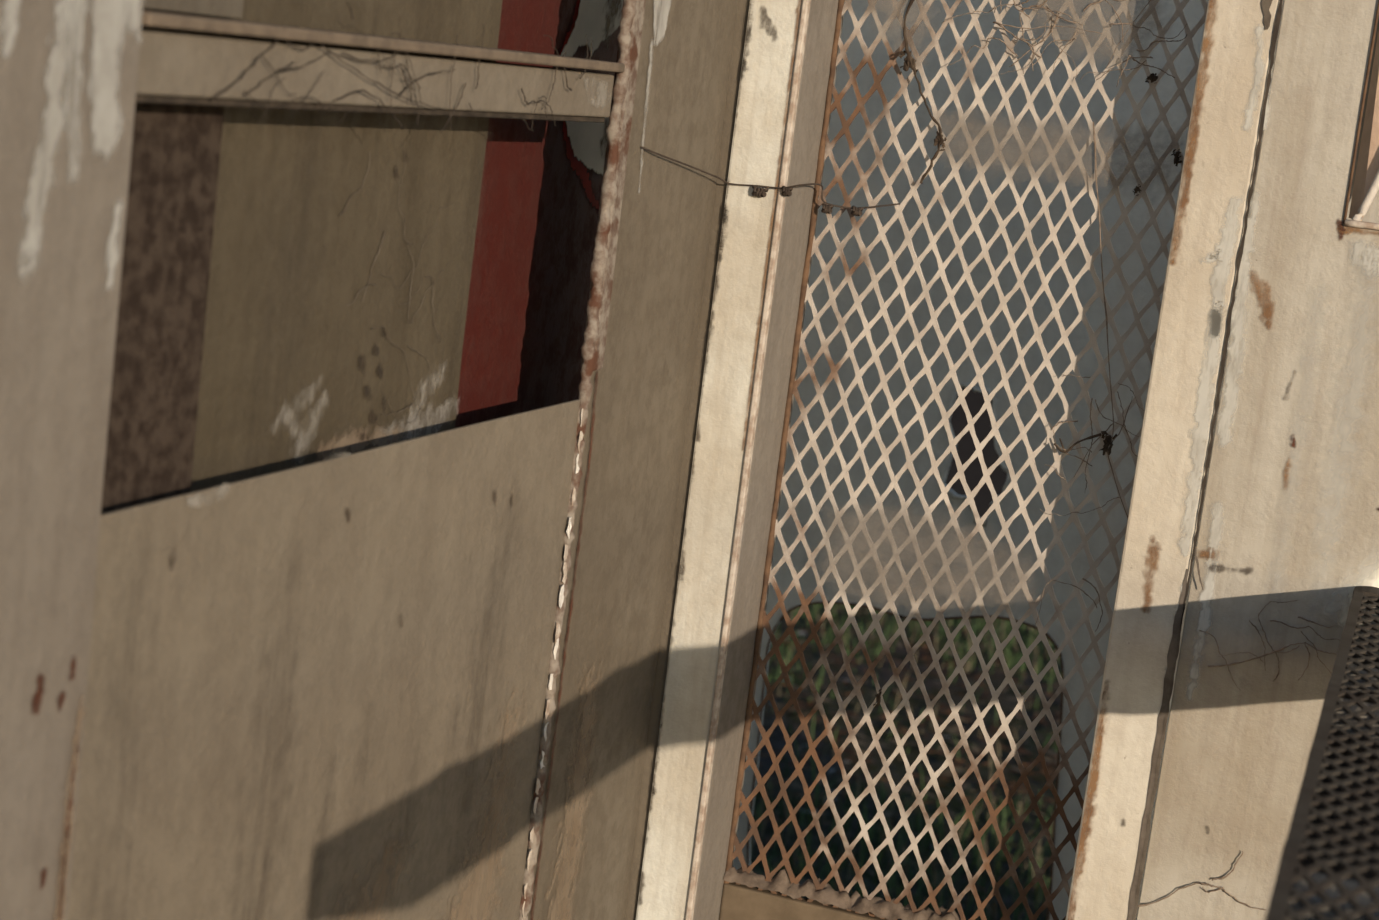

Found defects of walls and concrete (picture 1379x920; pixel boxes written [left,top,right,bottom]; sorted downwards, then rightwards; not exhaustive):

peeling [563,80,611,211]
peeling [559,0,623,57]
rust [1171,0,1216,264]
peeling [1244,26,1270,130]
rust [1337,220,1379,240]
rust [1252,275,1273,328]
peeling [1178,193,1259,700]
rust [1143,539,1159,612]
rust [32,660,84,920]
rust [1067,691,1106,920]